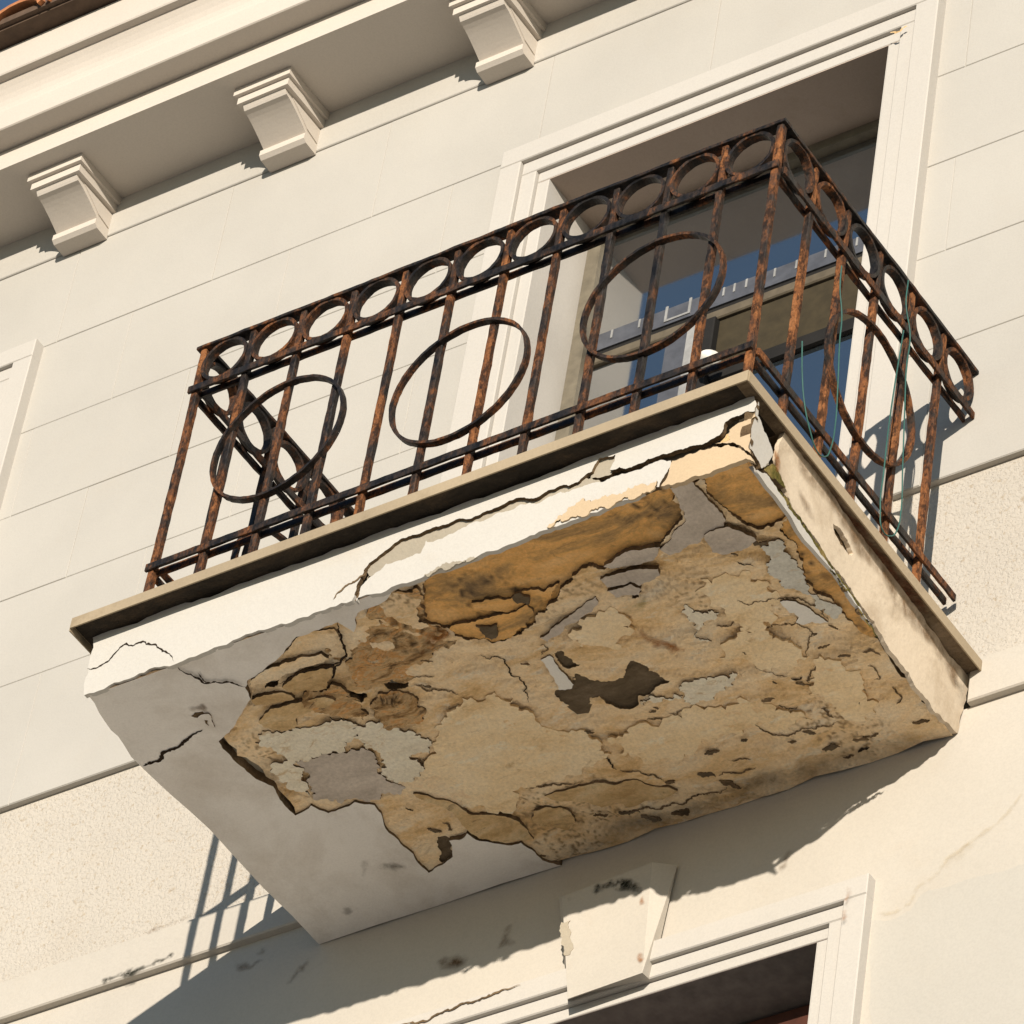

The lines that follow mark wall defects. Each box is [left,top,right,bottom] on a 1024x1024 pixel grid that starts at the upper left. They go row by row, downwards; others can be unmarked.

corrosion [837,500,924,610]
crack [334,572,367,598]
crack [88,641,243,687]
spalling [224,458,953,871]
crack [144,730,202,766]